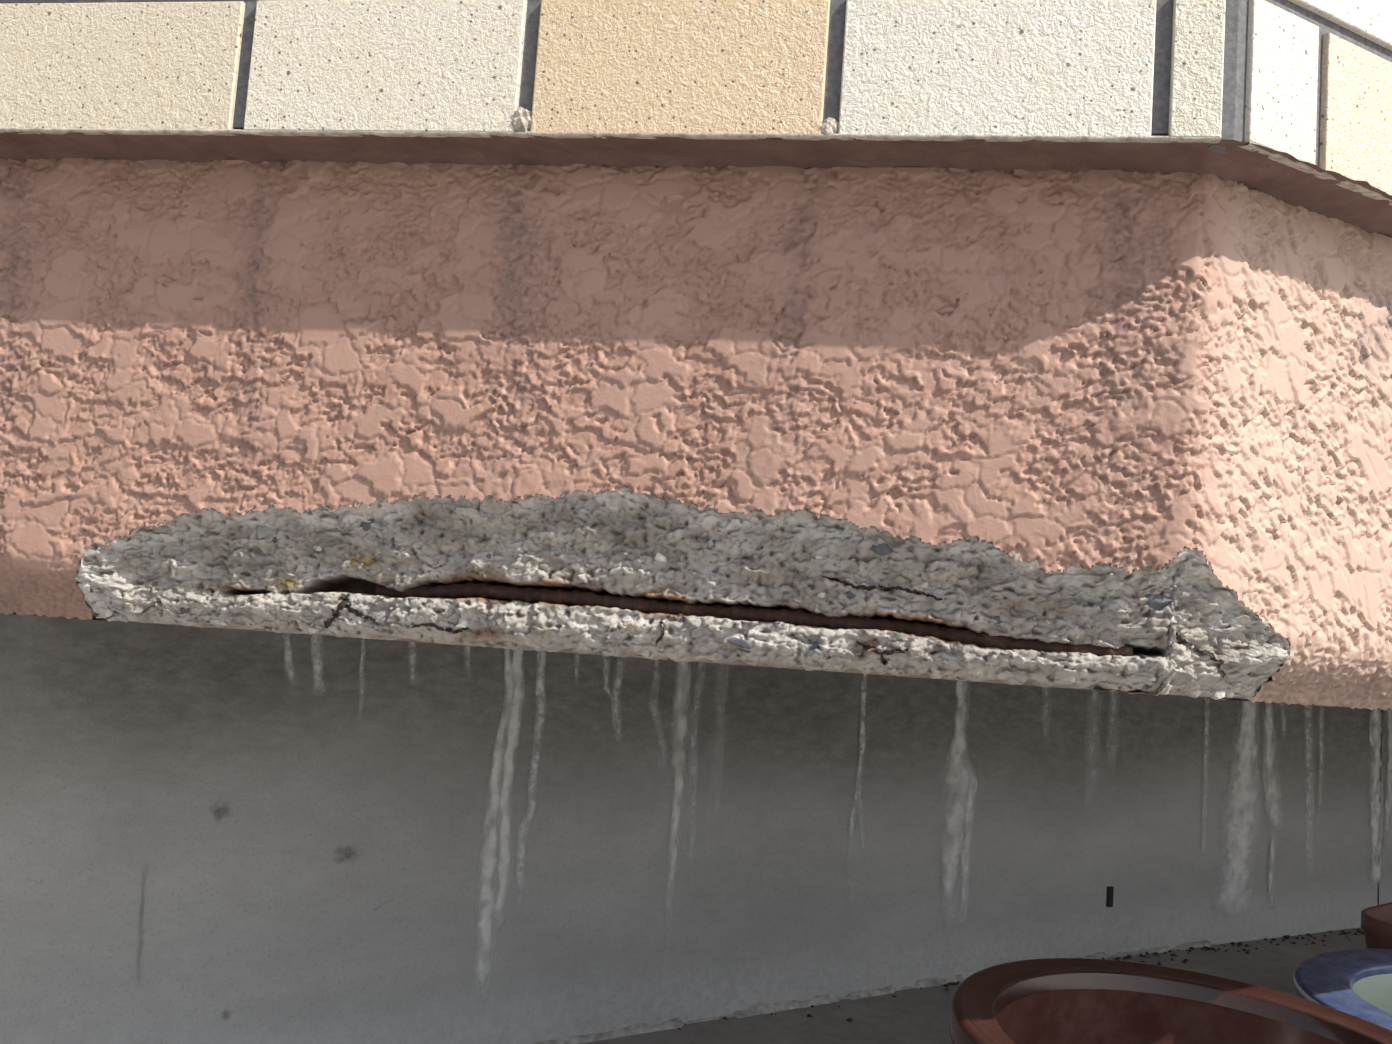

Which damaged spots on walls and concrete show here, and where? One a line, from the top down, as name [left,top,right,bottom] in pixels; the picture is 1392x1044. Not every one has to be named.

crack [324,594,375,628]
crack [411,623,470,634]
corrosion [444,575,732,616]
spalling [75,486,1295,700]
crack [821,575,943,601]
crack [856,641,908,665]
corrosion [845,612,982,653]
damp [476,649,545,986]
damp [667,661,703,890]
damp [943,680,976,903]
damp [1219,701,1285,912]
damp [1369,709,1392,882]